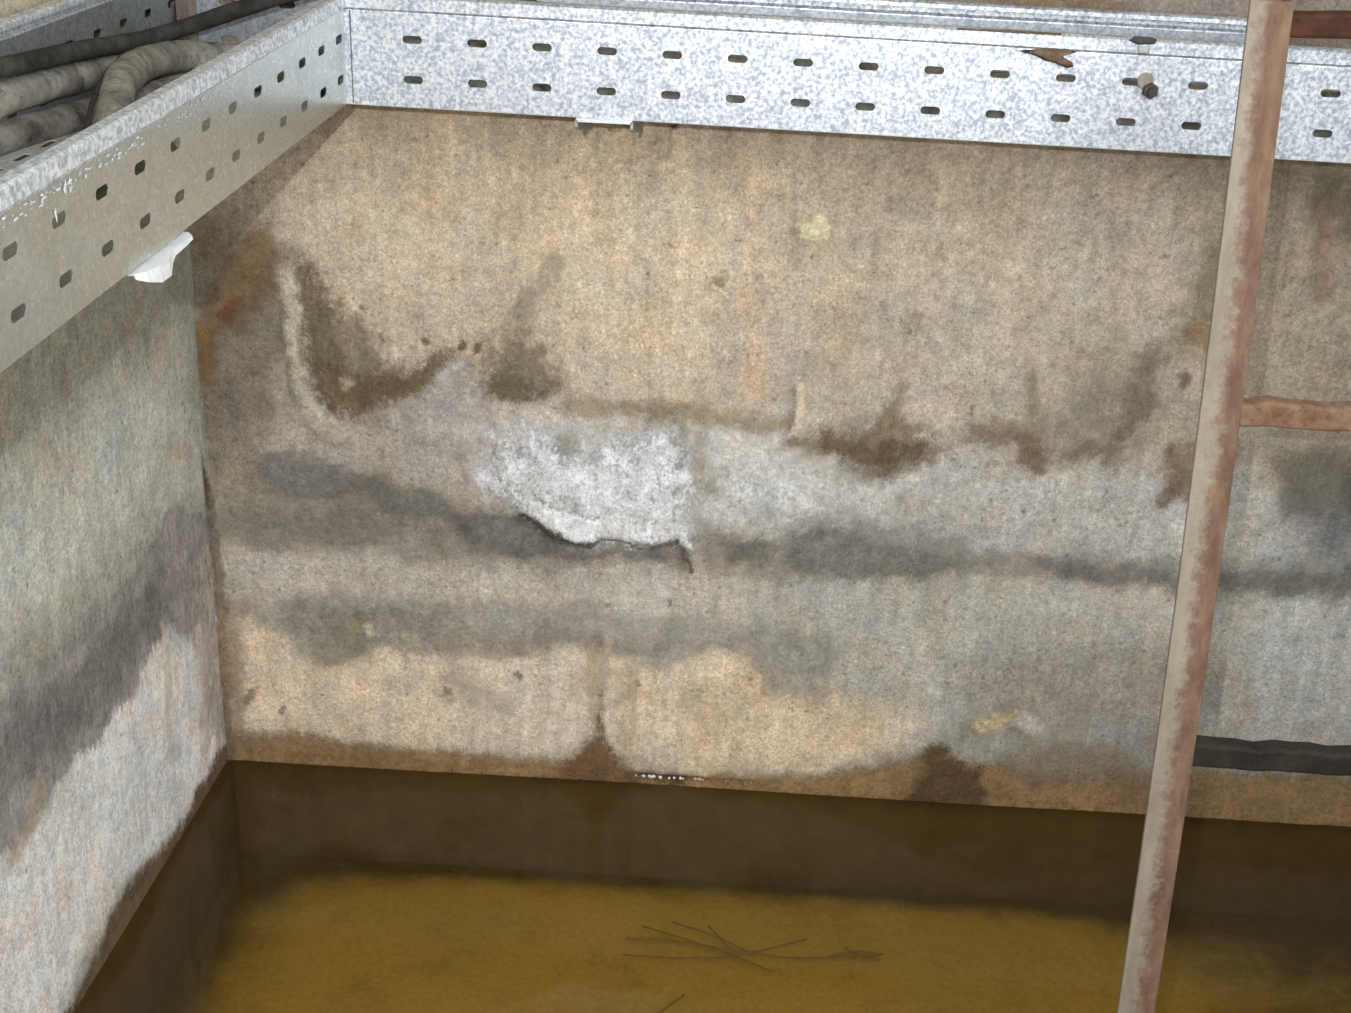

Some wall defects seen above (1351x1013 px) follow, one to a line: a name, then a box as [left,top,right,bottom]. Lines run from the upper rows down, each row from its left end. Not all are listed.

damp [1184,250,1219,346]
damp [1157,444,1194,508]
damp [1281,444,1351,512]
damp [1218,563,1351,602]
damp [0,262,1178,1013]
damp [1185,767,1351,827]